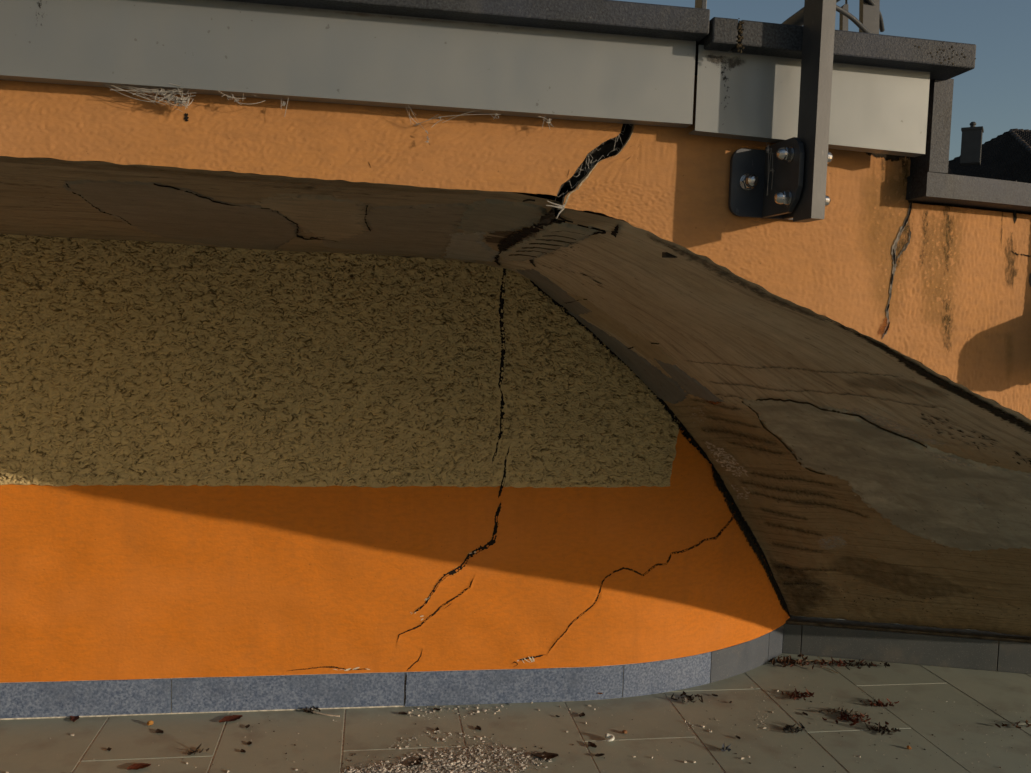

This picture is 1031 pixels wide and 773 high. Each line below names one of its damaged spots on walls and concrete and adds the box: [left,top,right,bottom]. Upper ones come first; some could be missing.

crack [398,124,792,703]
leakage [650,231,1031,434]
crack [882,200,912,339]